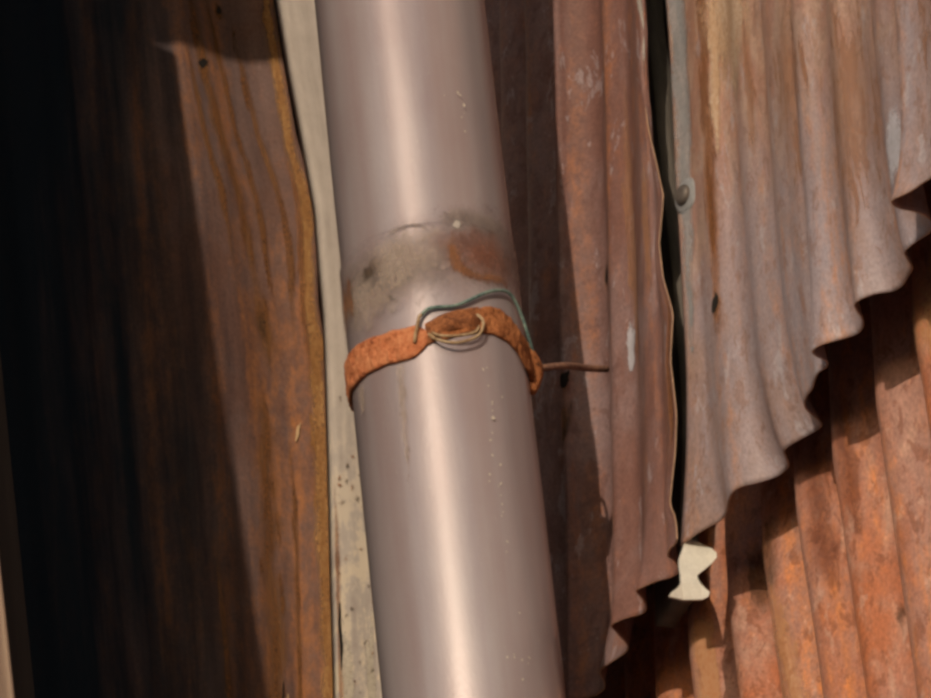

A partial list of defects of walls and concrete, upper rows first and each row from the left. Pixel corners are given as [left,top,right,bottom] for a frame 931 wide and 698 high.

rust [695,0,718,255]
rust [771,1,808,183]
rust [693,617,721,698]